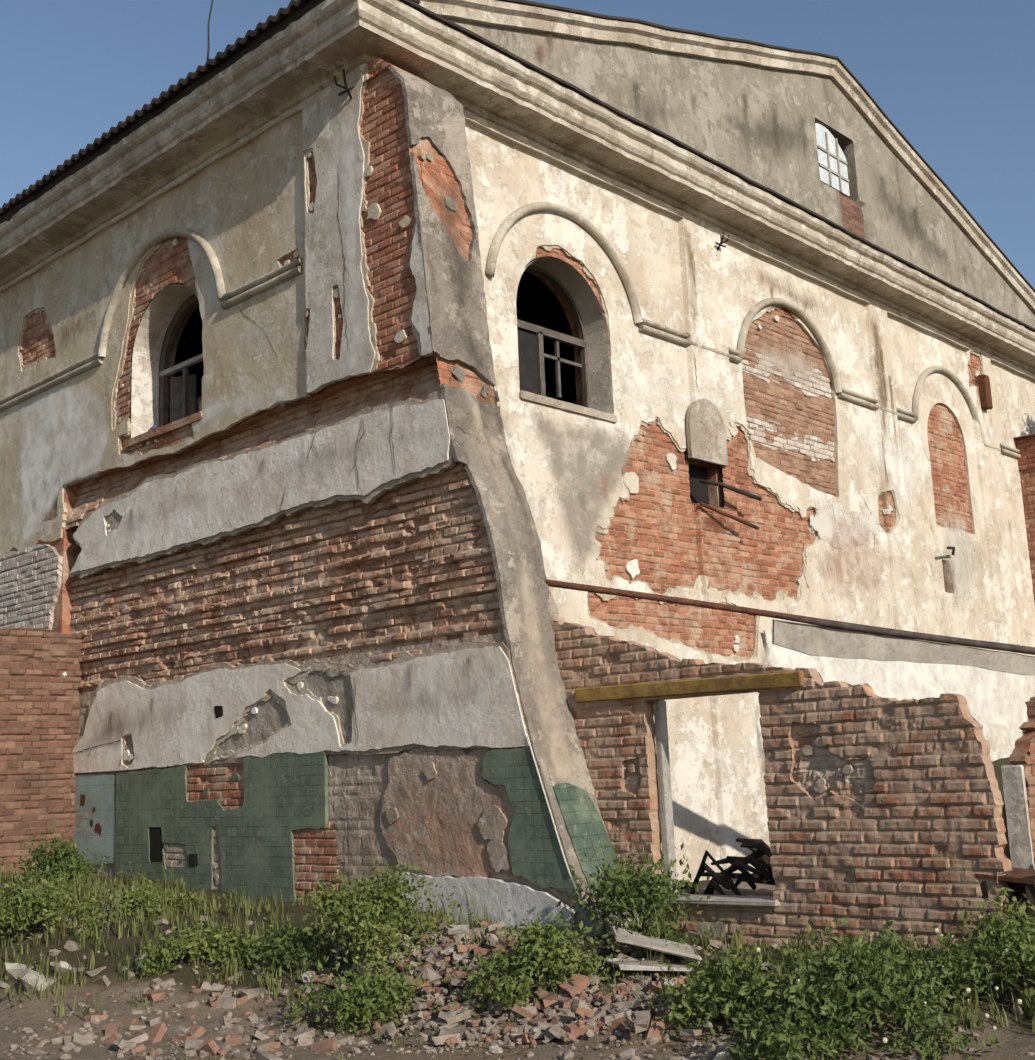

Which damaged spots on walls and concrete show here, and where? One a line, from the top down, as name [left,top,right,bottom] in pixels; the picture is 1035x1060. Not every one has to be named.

peeling [19,236,262,543]
spalling [70,57,495,579]
crack [349,424,366,488]
spalling [757,306,798,330]
spalling [587,386,1035,748]
spalling [74,641,527,880]
spalling [293,823,349,904]